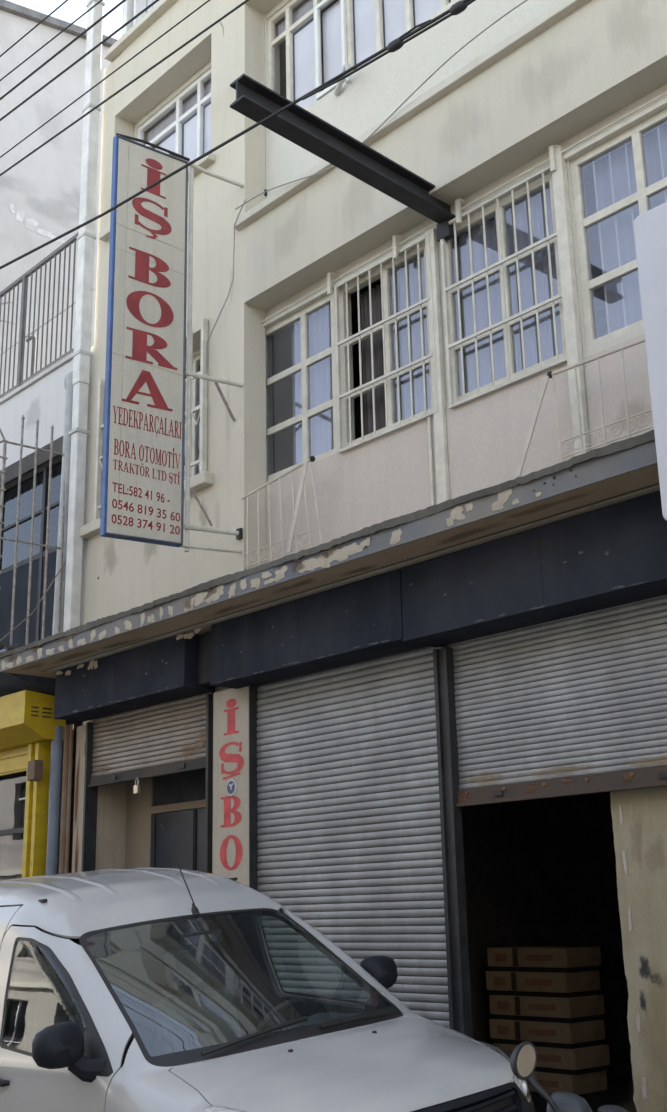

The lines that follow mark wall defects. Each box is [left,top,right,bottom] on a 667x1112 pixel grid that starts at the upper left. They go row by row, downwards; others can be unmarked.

peeling [492,487,519,511]
peeling [446,502,473,527]
peeling [389,529,402,545]
peeling [1,537,370,670]
spalling [56,659,98,676]
leakage [640,958,660,983]